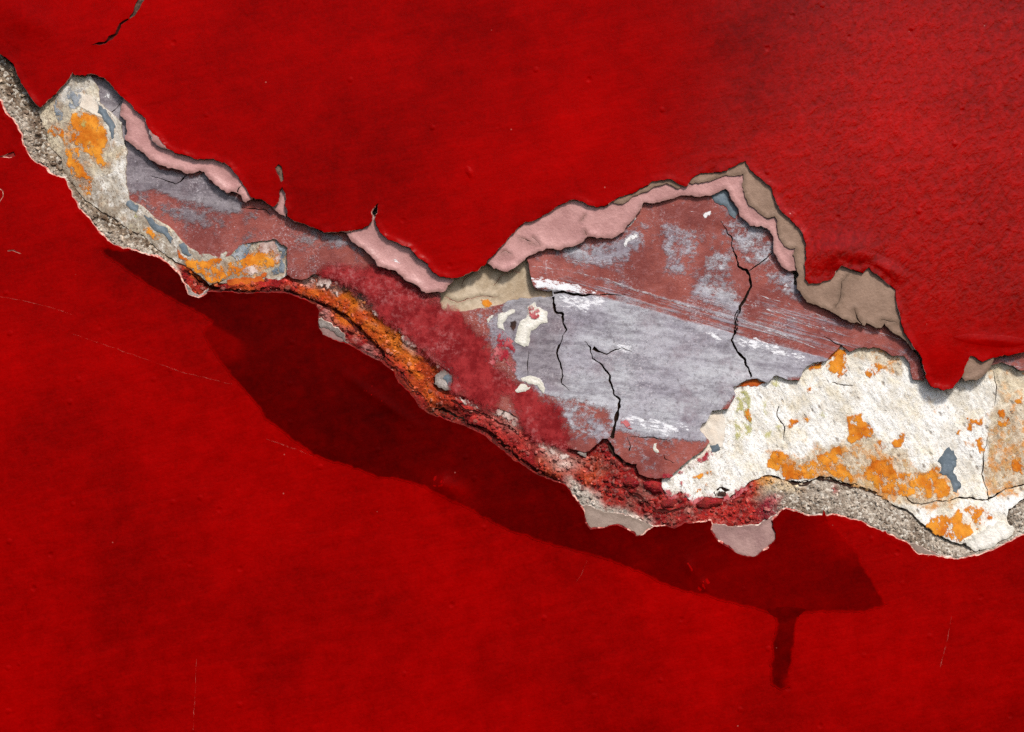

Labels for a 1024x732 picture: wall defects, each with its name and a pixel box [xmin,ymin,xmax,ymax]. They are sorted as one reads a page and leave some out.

crack [96,19,128,45]
peeling [0,55,1024,559]
crack [552,290,688,513]
crack [721,222,773,378]